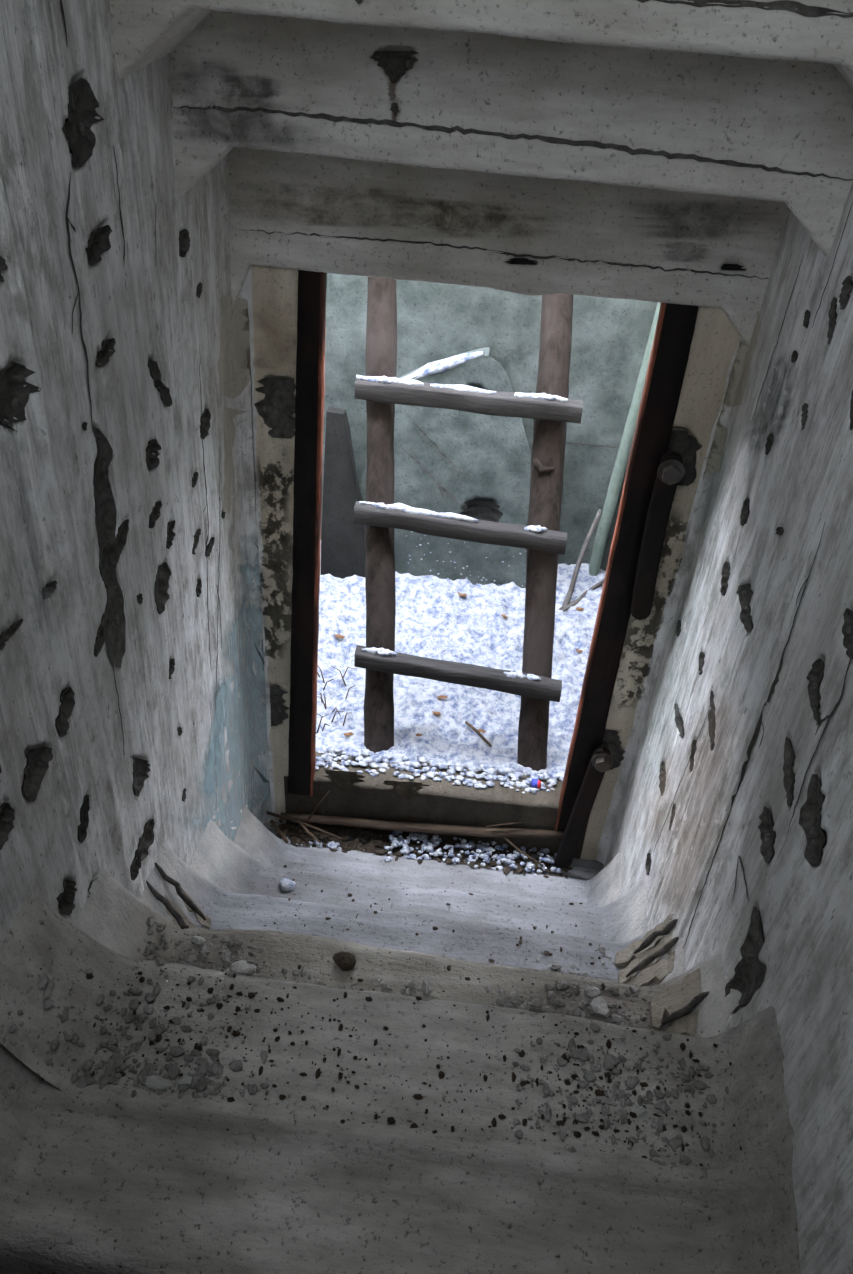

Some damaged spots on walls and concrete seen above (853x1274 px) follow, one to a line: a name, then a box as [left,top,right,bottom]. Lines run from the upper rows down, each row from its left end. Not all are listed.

crack [637,0,853,18]
spalling [62,78,105,168]
crack [172,105,853,420]
spalling [82,422,176,668]
spalling [192,528,215,557]
spalling [21,687,75,802]
spalling [0,803,15,850]
spalling [758,806,776,864]
spalling [783,737,827,866]
spalling [615,914,702,1036]
spalling [725,906,766,1012]